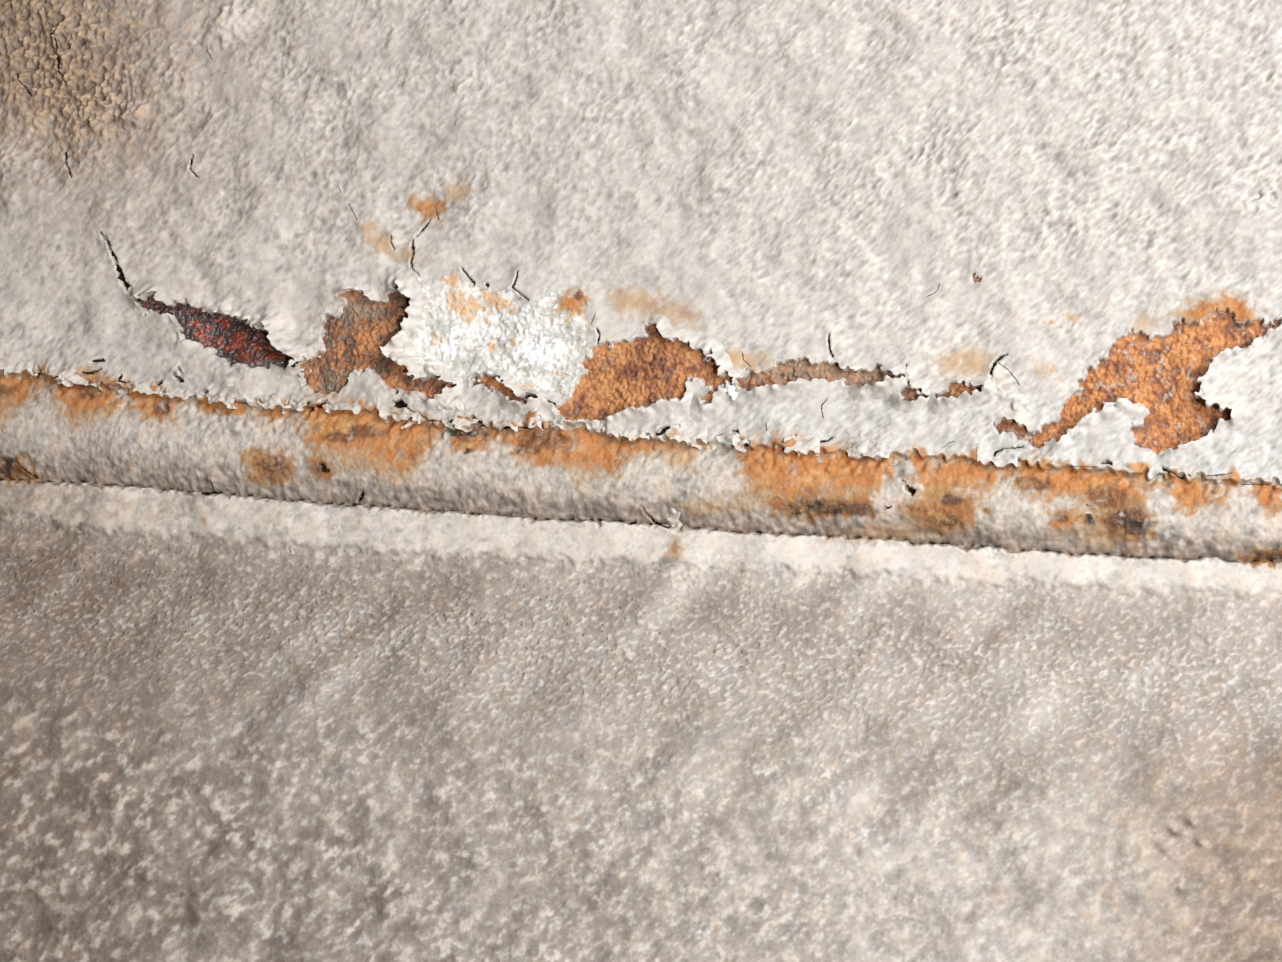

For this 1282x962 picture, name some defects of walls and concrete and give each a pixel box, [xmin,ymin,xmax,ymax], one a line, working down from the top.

rust [1177,292,1261,324]
peeling [0,349,97,387]
peeling [127,264,1282,467]
crack [882,458,916,495]
crack [1162,468,1269,485]
crack [628,512,670,528]